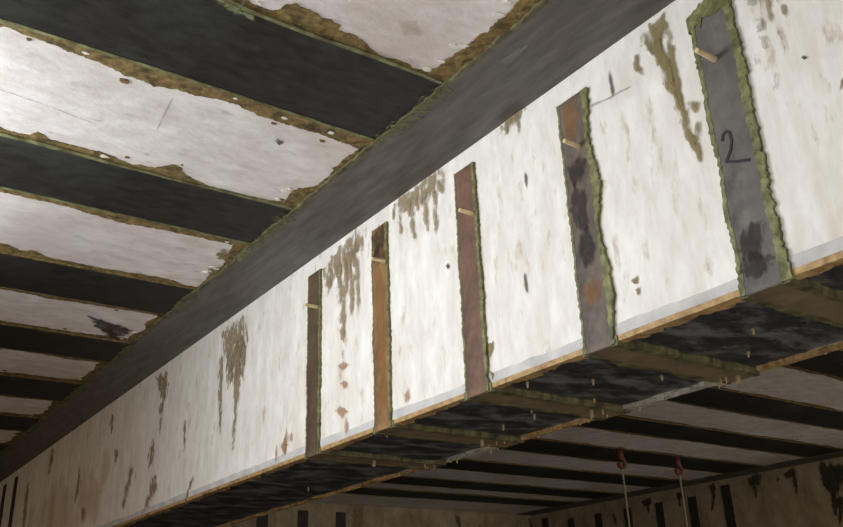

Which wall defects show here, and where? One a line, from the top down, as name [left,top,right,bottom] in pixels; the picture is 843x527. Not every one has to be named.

peeling [235,0,378,55]
peeling [387,0,541,81]
water stain [747,0,772,49]
peeling [0,23,372,207]
water stain [640,13,701,161]
peeling [0,188,247,289]
water stain [392,169,444,239]
water stain [323,225,385,335]
water stain [88,316,133,340]
water stain [218,315,248,450]
water stain [820,461,843,524]